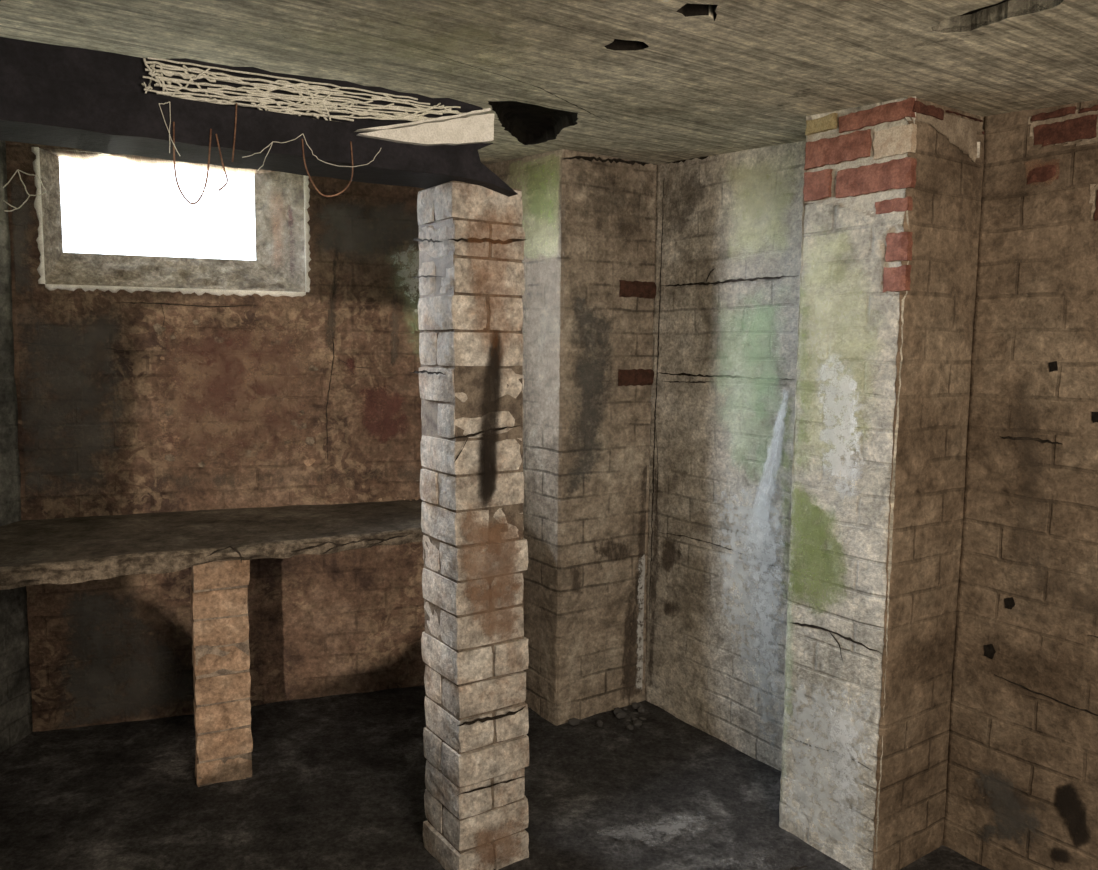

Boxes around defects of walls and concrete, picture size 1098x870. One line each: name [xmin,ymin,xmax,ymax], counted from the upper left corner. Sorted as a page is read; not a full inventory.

spalling [1028,105,1098,147]
spalling [1025,159,1059,185]
spalling [803,97,985,296]
spalling [1089,184,1098,221]
water stain [483,433,495,508]